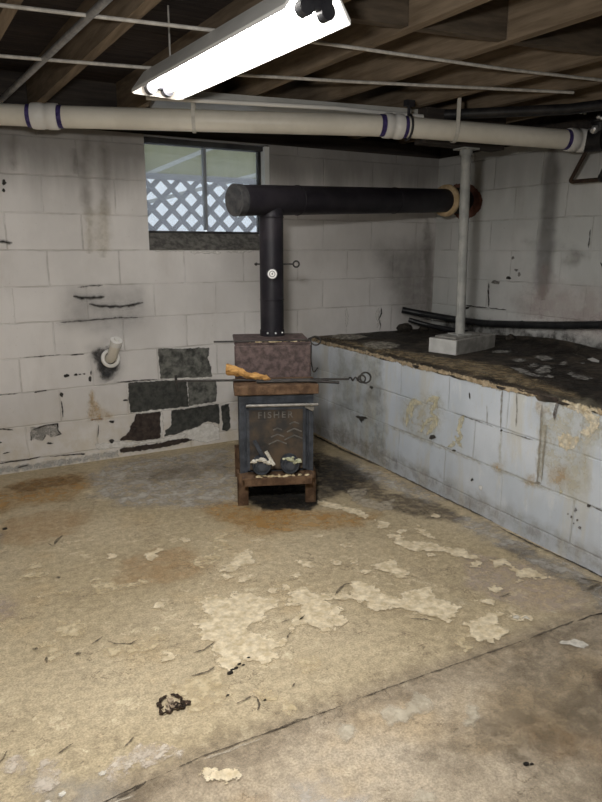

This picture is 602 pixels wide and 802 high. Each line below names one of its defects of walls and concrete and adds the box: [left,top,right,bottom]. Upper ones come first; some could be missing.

peeling [30,423,61,441]
peeling [109,347,230,453]
peeling [311,336,602,451]
peeling [172,533,533,715]
peeling [559,639,589,649]
crack [104,613,602,802]
peeling [199,767,242,789]